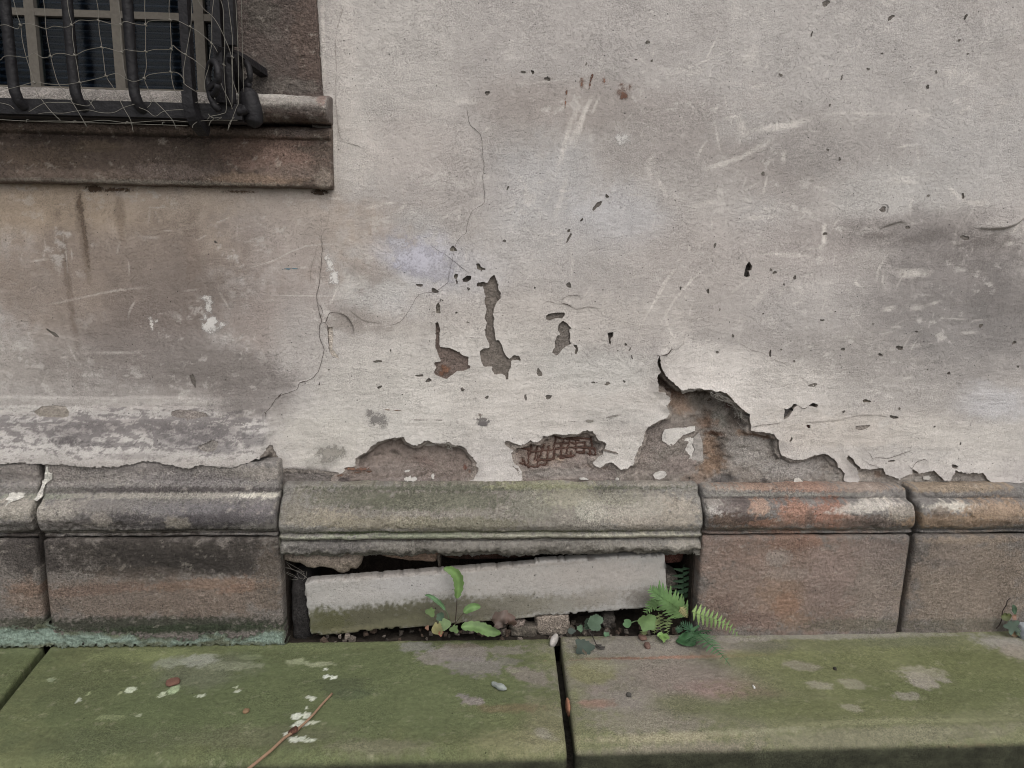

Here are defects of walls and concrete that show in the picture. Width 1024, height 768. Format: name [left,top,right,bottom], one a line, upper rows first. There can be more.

leakage [76,185,130,267]
crack [264,113,485,417]
leakage [201,295,225,333]
spalling [415,263,521,382]
spalling [546,313,578,355]
spalling [260,445,278,458]
spalling [282,437,478,497]
rust [519,436,597,468]
spalling [505,359,988,486]